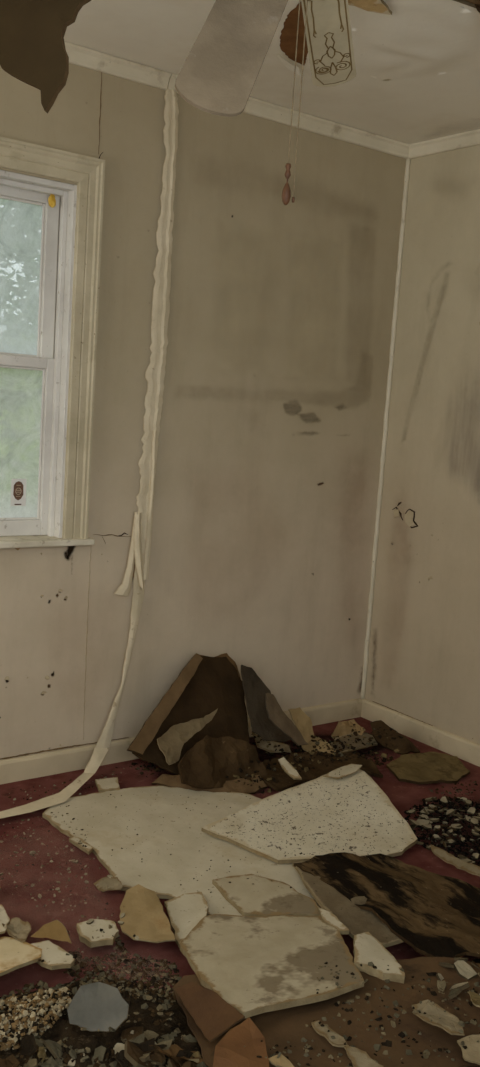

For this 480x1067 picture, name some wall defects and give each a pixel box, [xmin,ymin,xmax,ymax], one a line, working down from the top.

spalling [277,2,308,76]